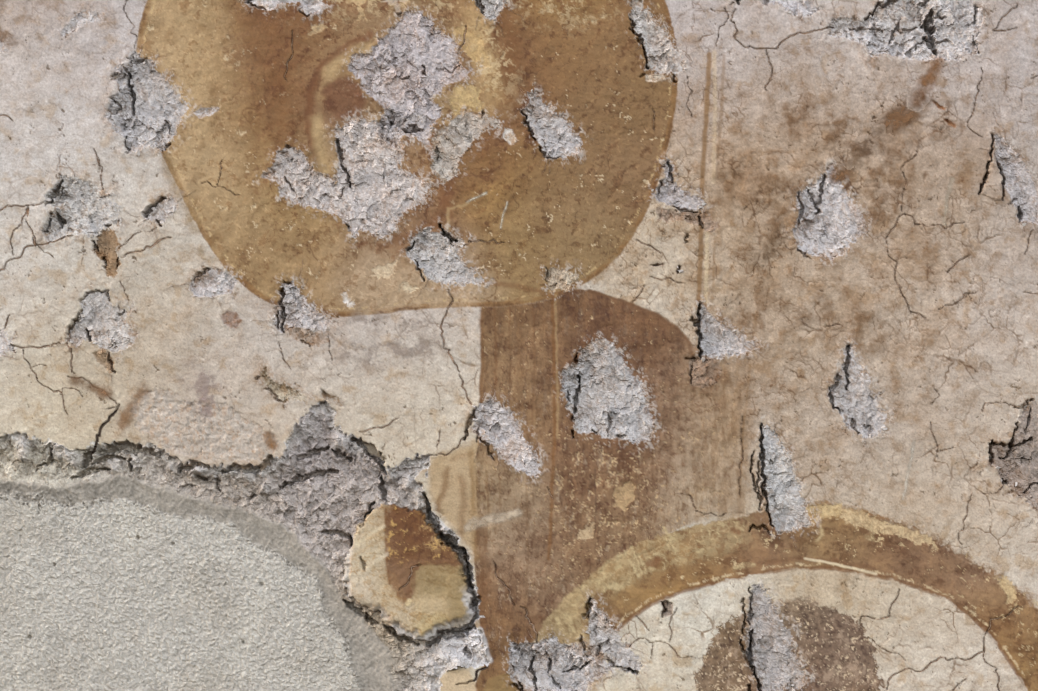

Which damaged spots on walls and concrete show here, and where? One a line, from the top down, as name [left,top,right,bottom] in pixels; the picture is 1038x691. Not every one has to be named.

crack [716,8,833,87]
spalling [827,0,993,76]
spalling [261,0,583,297]
crack [0,203,73,270]
spalling [788,163,870,262]
crack [5,316,119,457]
crack [440,292,471,404]
spalling [464,386,542,480]
spalling [561,339,666,446]
spalling [749,418,940,552]
crack [457,666,488,685]
crack [860,589,1019,691]